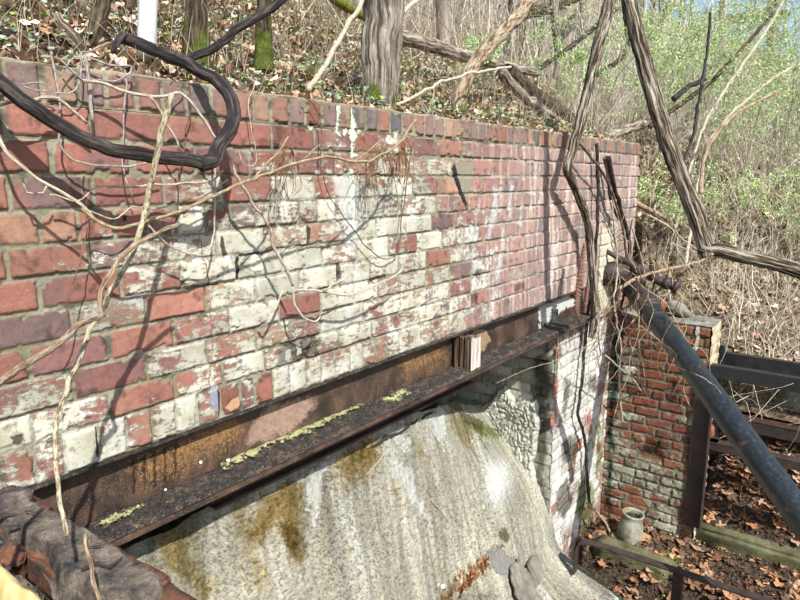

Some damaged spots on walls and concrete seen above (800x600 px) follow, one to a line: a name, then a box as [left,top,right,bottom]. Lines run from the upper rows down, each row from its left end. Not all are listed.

peeling [0,135,522,489]
rust [473,329,491,351]
peeling [538,283,575,329]
rust [125,395,317,493]
damp [304,459,330,535]
crack [371,411,433,448]
damp [382,433,432,521]
damp [426,404,448,452]
peeling [549,308,693,560]